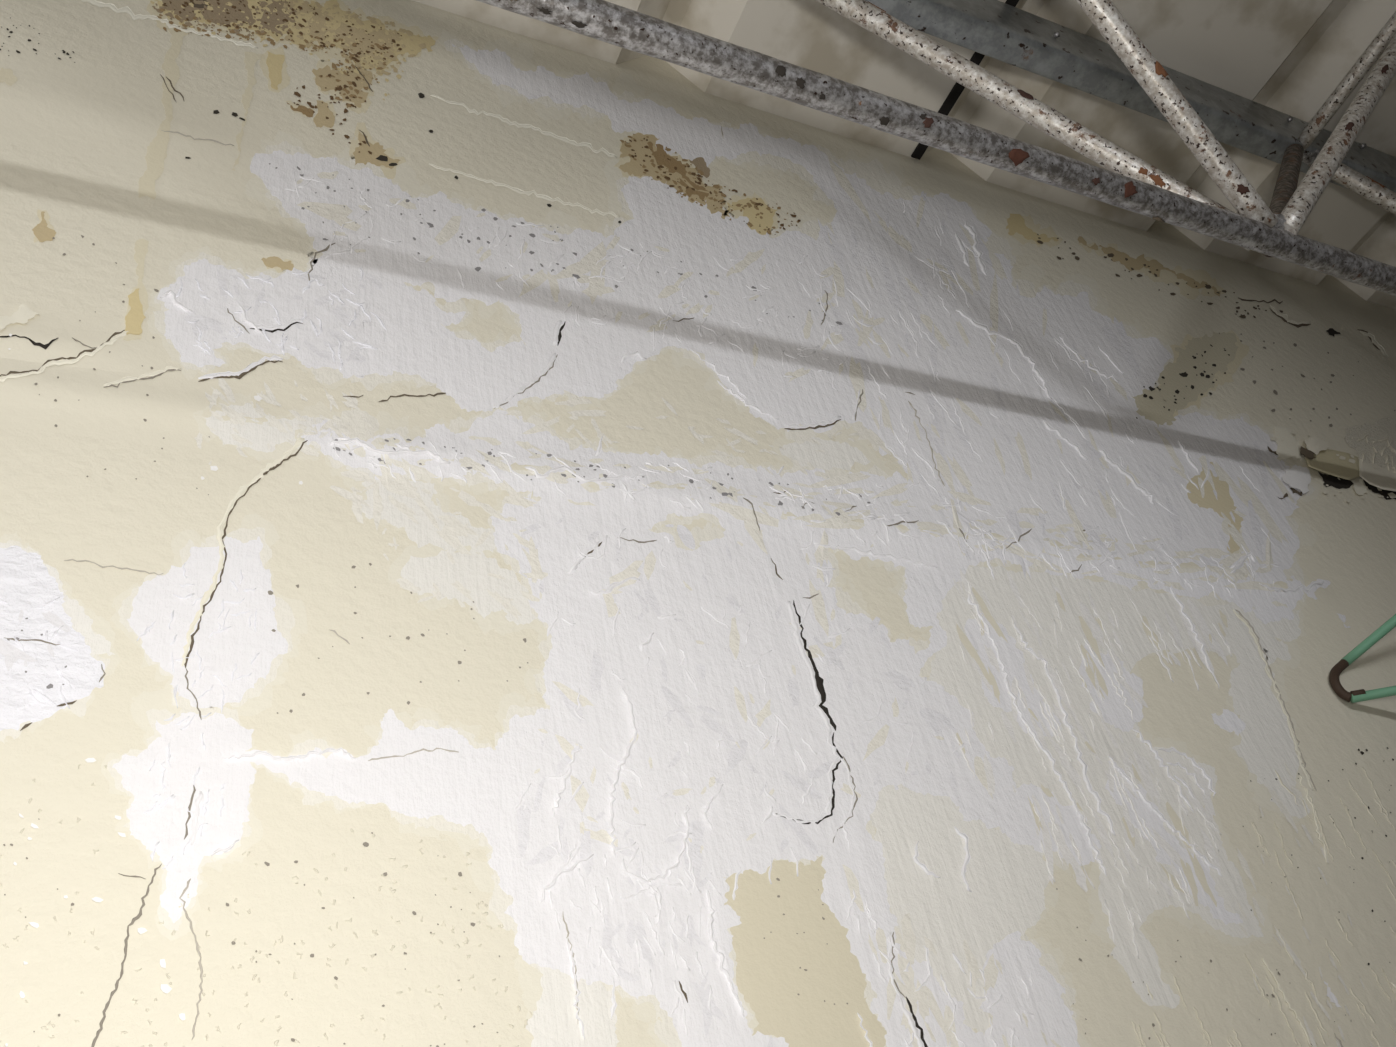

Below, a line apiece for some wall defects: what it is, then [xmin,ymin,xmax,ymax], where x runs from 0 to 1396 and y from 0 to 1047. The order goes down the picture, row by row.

corrosion [146,0,439,179]
corrosion [613,133,779,235]
crack [308,243,335,281]
spalling [459,208,597,279]
crack [0,308,303,388]
crack [64,559,163,575]
crack [181,438,308,720]
crack [743,490,858,843]
crack [91,785,205,1047]
flaking render [724,856,887,1047]
crack [887,932,928,1047]